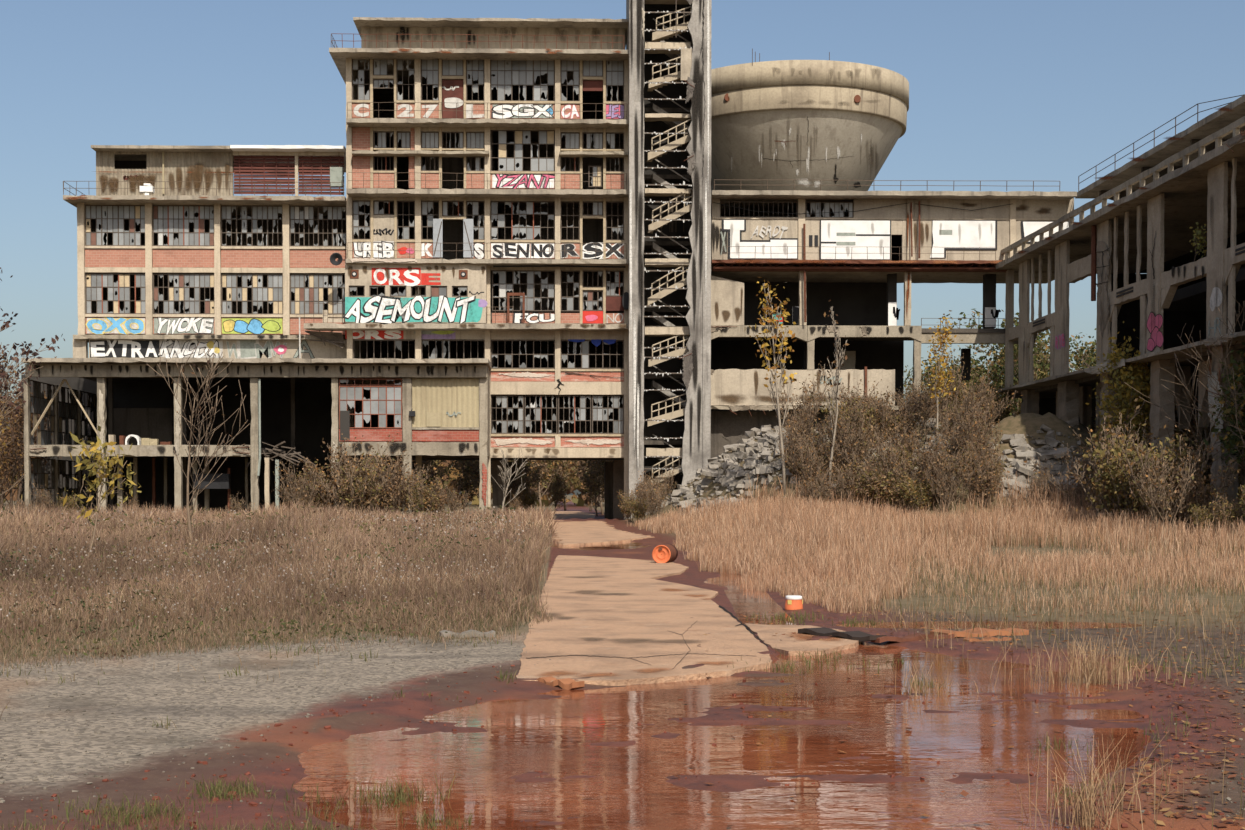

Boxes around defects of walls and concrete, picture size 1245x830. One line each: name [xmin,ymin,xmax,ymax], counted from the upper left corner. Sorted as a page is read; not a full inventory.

water stain [100,163,230,191]
water stain [796,148,820,187]